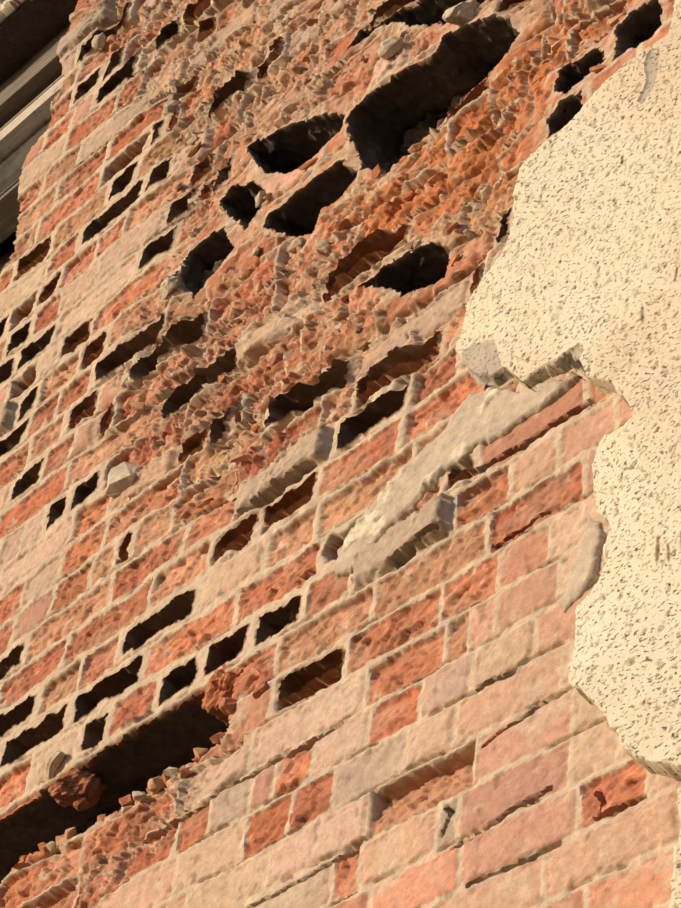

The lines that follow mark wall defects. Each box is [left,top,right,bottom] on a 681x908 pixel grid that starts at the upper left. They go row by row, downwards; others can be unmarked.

spalling [0,294,61,383]
spalling [73,0,663,559]
spalling [0,394,60,499]
spalling [0,695,35,737]
spalling [0,704,67,766]
spalling [0,577,153,709]
spalling [74,655,142,722]
spalling [108,658,198,738]
spalling [122,542,321,678]
spalling [218,595,301,716]
spalling [278,462,584,745]
spalling [0,724,248,908]